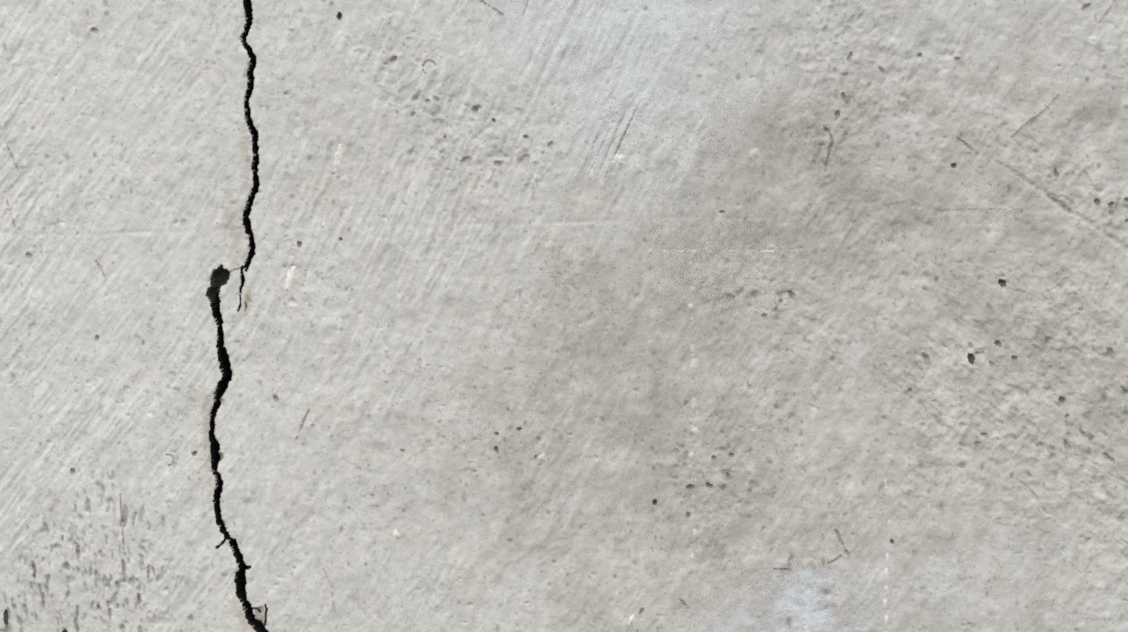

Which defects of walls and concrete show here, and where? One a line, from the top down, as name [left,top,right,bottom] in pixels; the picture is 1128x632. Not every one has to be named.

crack [205,0,269,632]